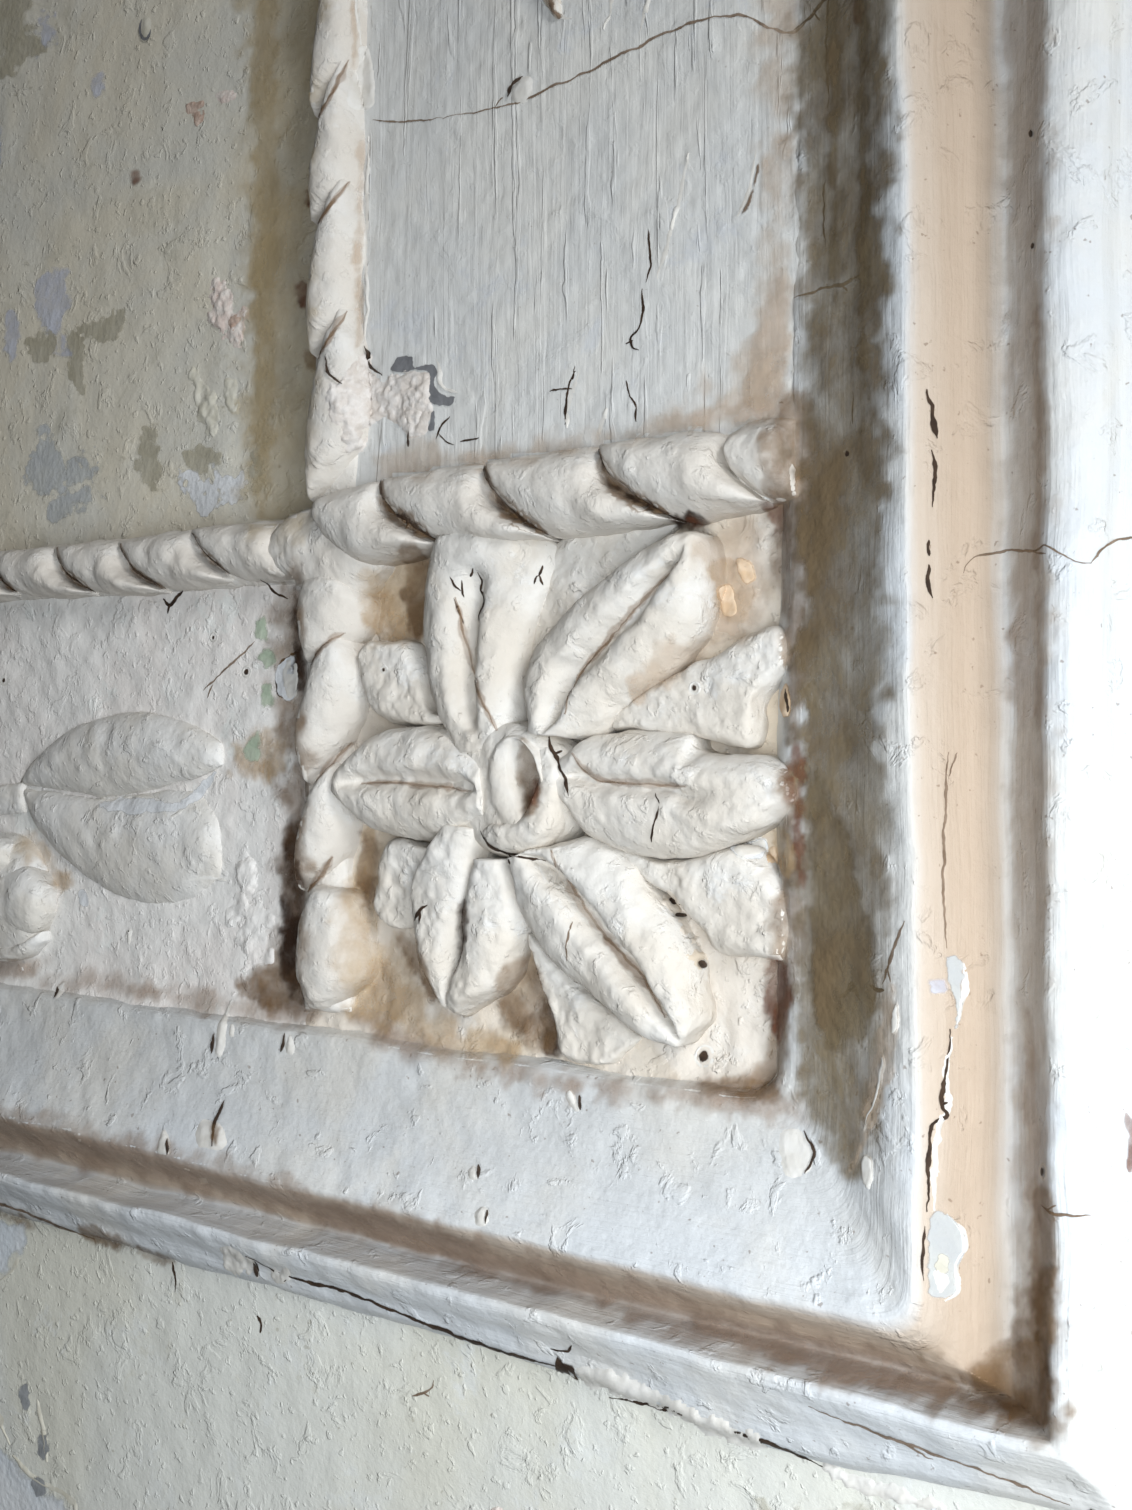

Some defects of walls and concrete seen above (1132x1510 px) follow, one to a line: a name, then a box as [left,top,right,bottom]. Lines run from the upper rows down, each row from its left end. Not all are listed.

peeling [0,0,47,79]
crack [373,7,817,123]
spalling [325,136,457,453]
crack [920,1029,953,1281]
peeling [0,1221,27,1281]
spalling [220,1246,291,1284]
peeling [474,1207,489,1226]
peeling [0,1384,78,1510]
spalling [555,1356,767,1450]
spalling [822,1463,946,1510]